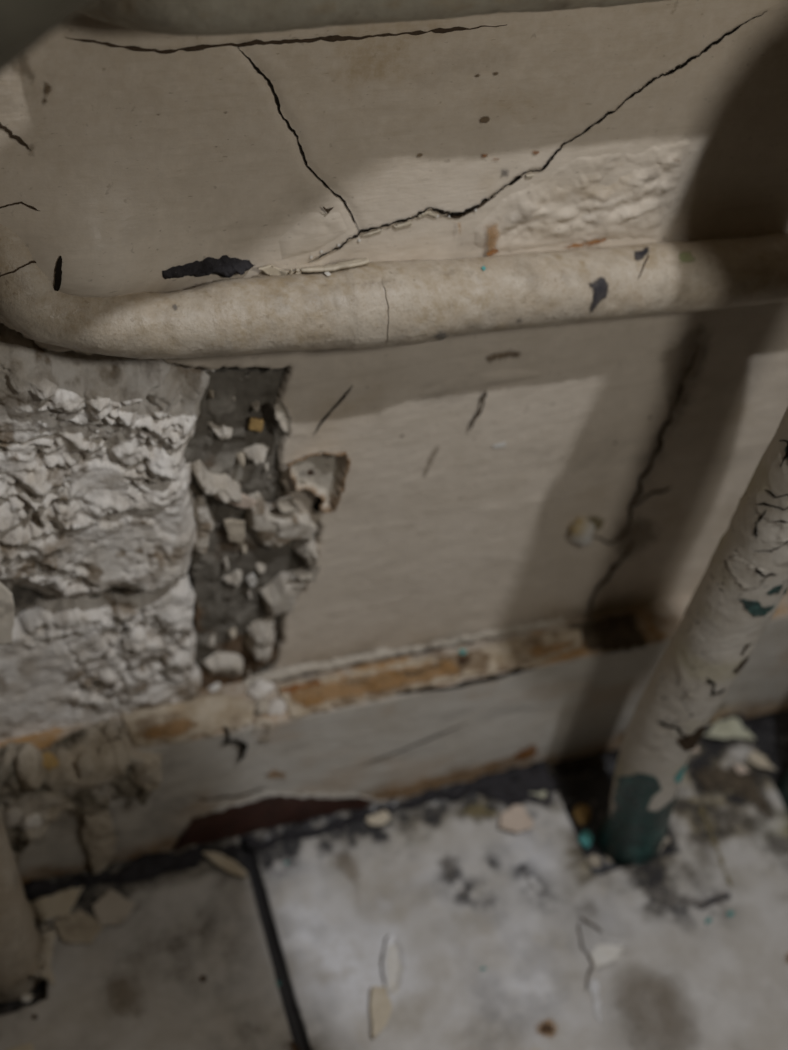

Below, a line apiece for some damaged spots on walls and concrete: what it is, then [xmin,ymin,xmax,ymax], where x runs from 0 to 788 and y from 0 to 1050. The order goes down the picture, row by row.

crack [0,123,32,151]
crack [66,11,767,263]
crack [587,343,699,619]
crack [779,440,788,468]
flaking render [0,323,351,747]
crack [753,489,788,578]
peeling [739,585,788,617]
peeling [733,644,751,674]
peeling [674,717,777,783]
leakage [460,788,555,819]
leakage [695,764,775,819]
leakage [643,807,734,924]